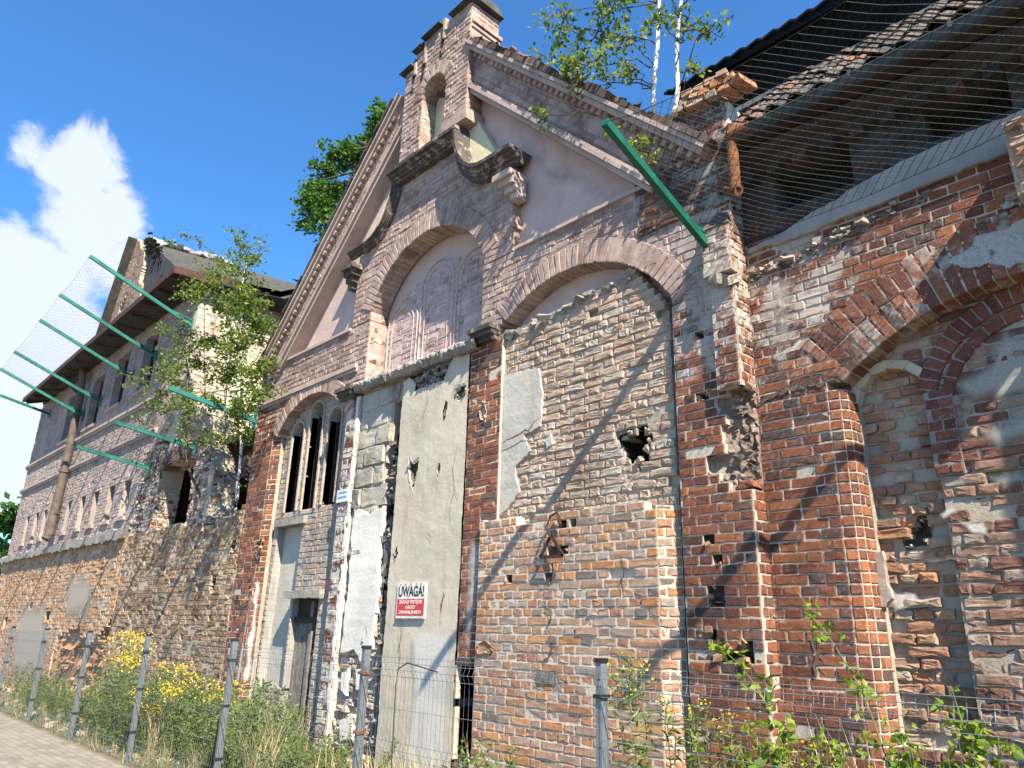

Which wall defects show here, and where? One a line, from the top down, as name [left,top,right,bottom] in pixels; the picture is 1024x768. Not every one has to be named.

spalling [750,189,932,282]
peeling [947,219,1024,268]
spalling [413,361,453,389]
peeling [499,368,554,516]
spalling [625,426,652,466]
spalling [697,388,764,492]
spalling [407,457,419,492]
peeling [340,506,398,696]
peeling [339,715,356,741]